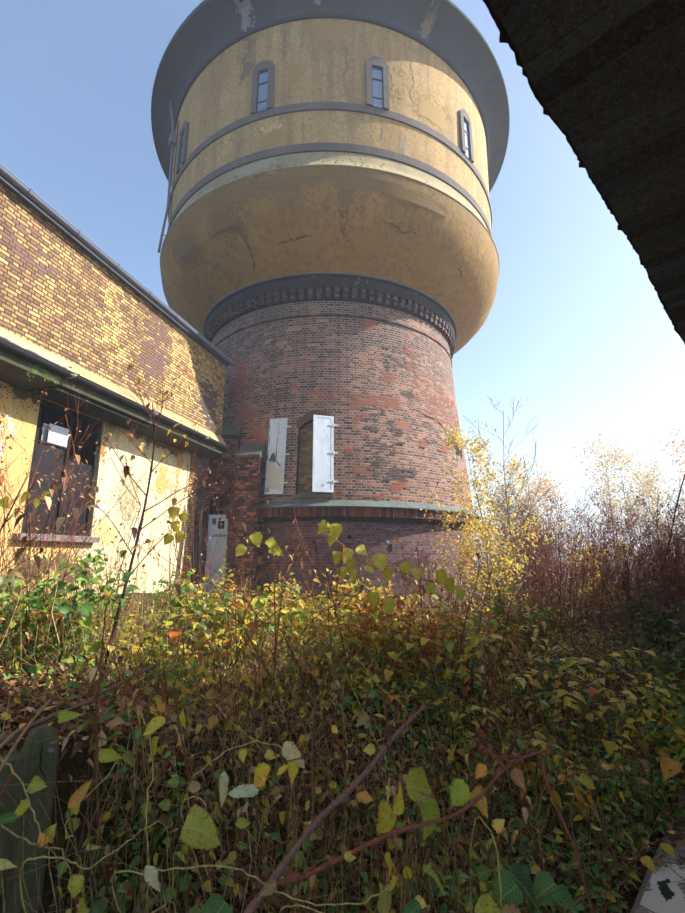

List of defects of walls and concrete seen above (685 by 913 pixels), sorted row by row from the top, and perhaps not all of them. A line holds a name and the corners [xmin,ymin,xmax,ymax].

peeling [0,384,20,448]